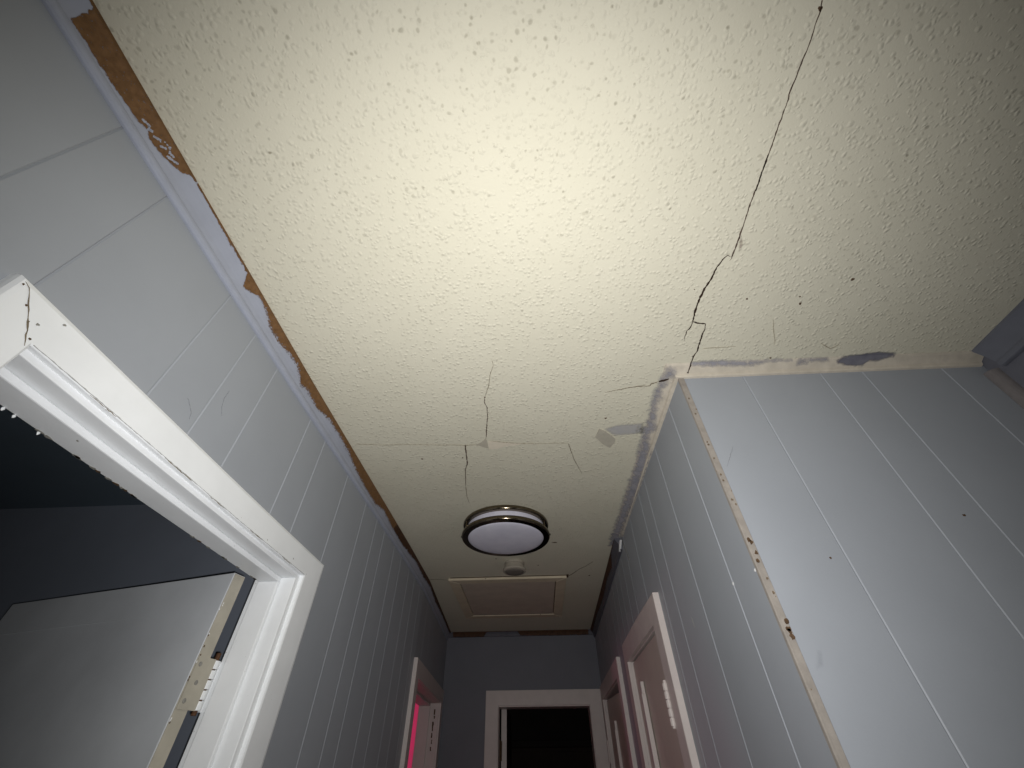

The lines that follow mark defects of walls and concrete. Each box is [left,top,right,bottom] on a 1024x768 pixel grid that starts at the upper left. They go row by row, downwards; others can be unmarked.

crack [22,282,304,574]
peeling [71,0,622,637]
crack [359,362,580,501]
crack [605,0,823,393]